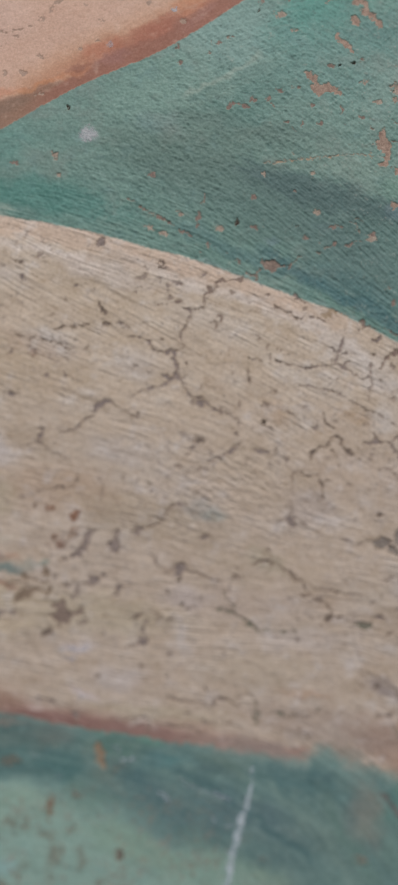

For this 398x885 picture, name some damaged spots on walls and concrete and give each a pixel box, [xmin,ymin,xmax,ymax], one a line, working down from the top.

peeling [350,0,383,28]
peeling [297,71,344,112]
peeling [371,129,398,175]
crack [9,269,261,492]
crack [247,330,398,500]
crack [286,509,306,529]
spalling [365,530,398,556]
spalling [6,566,88,638]
crack [64,573,106,595]
crack [151,555,296,634]
crack [253,549,345,625]
crack [126,613,172,650]